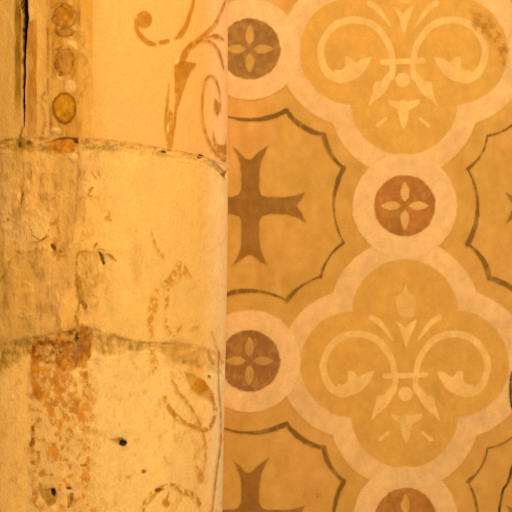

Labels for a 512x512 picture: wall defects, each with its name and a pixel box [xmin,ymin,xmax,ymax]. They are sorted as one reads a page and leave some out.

crack [19,0,35,137]
water stain [156,334,208,383]
peeling [27,354,102,512]